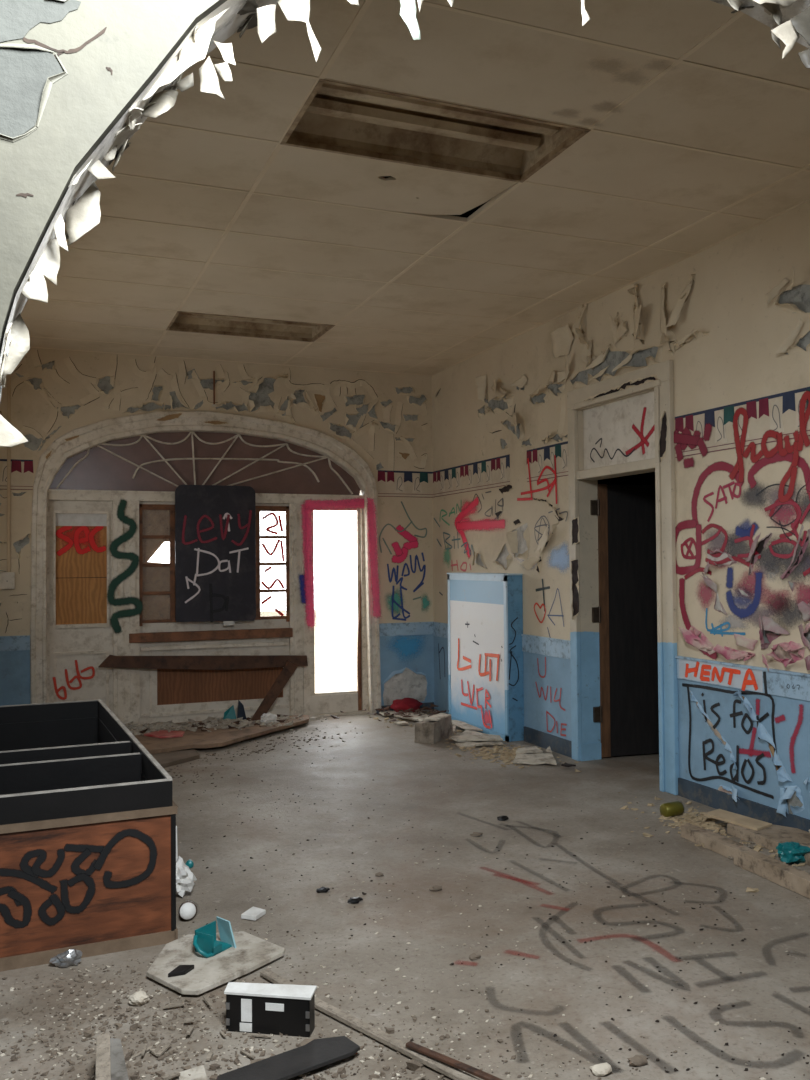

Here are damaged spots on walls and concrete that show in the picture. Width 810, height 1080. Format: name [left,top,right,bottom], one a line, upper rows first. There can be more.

peeling [400,0,423,40]
peeling [581,0,590,26]
peeling [727,0,810,69]
peeling [21,0,321,303]
peeling [0,313,83,460]
peeling [122,369,428,460]
peeling [475,274,710,450]
peeling [658,411,667,463]
peeling [472,498,580,574]
peeling [571,559,579,621]
peeling [679,525,810,672]
peeling [733,689,810,817]